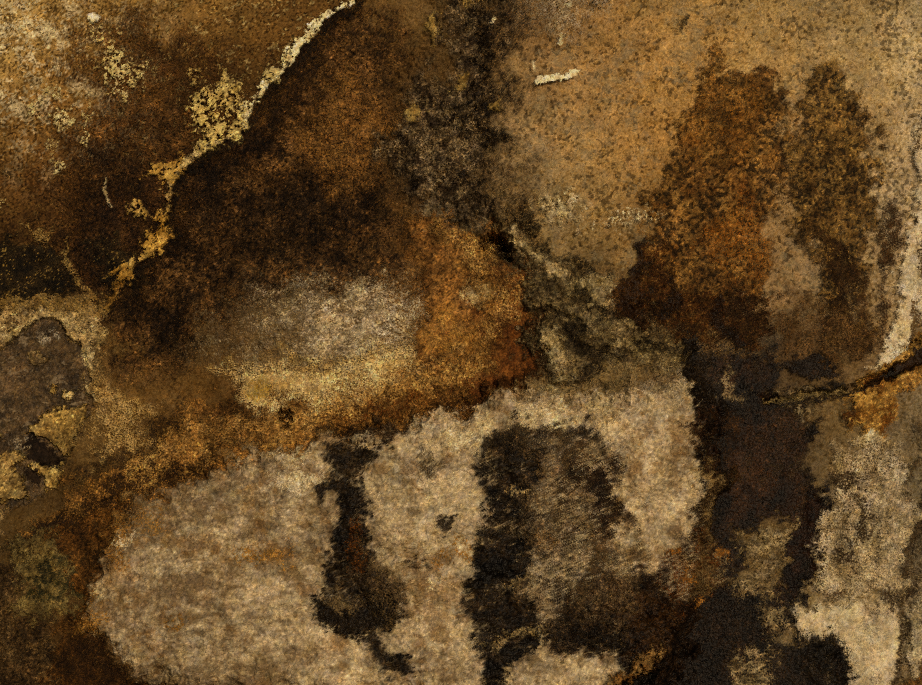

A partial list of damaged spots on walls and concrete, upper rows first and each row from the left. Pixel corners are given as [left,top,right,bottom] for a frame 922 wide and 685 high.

crack [101,0,364,316]
leakage [0,0,605,463]
flaking render [0,294,109,535]
leakage [311,439,422,682]
leakage [417,445,446,478]
leakage [460,120,922,685]
crack [763,335,922,405]